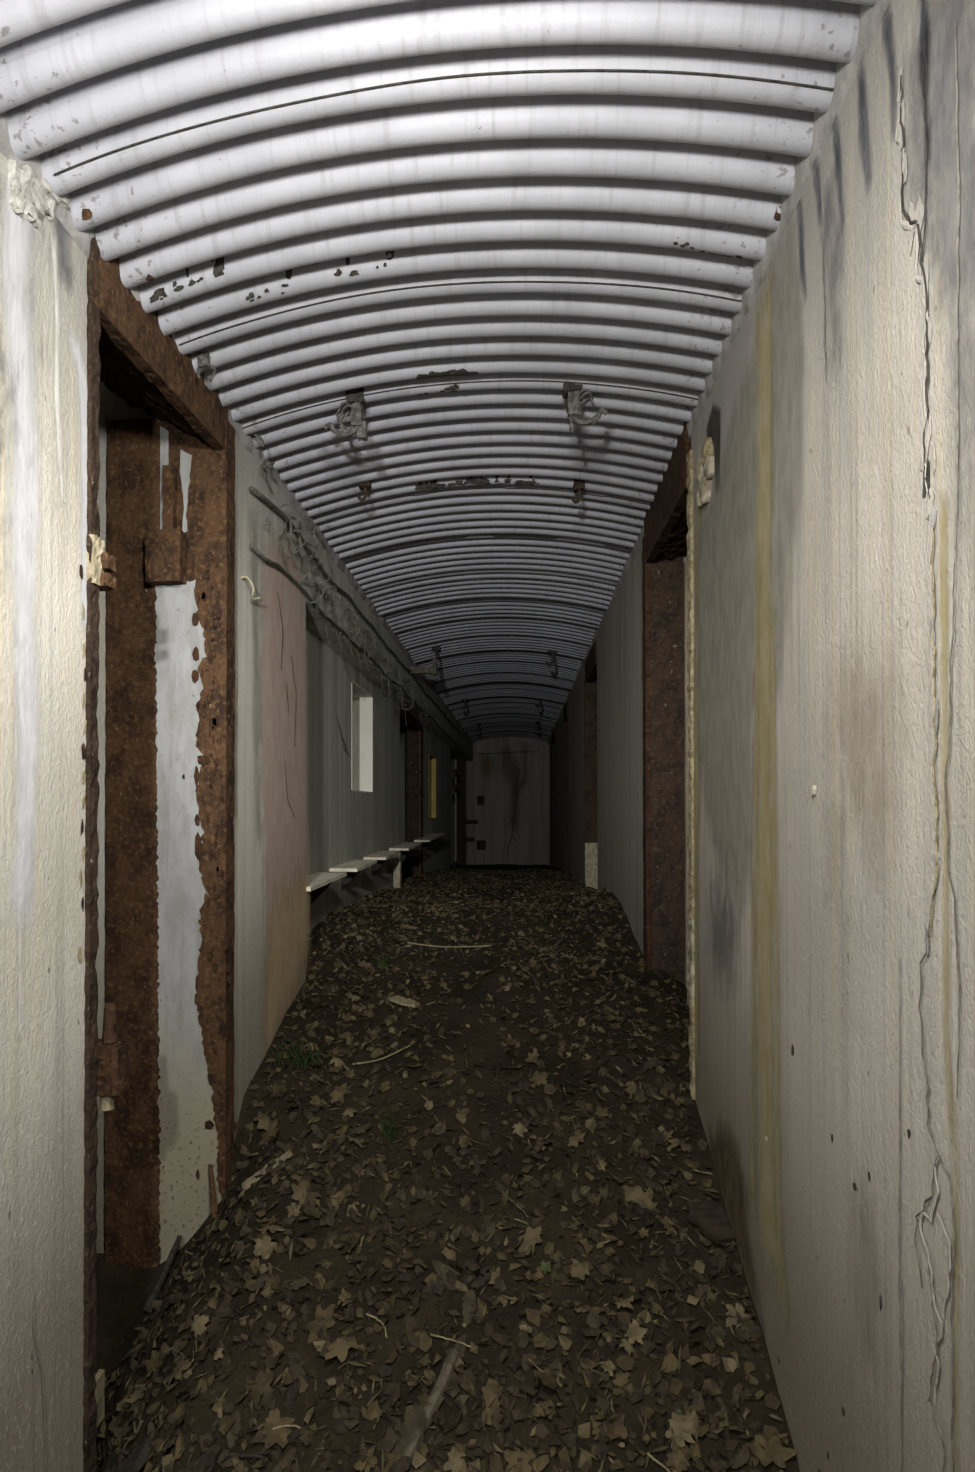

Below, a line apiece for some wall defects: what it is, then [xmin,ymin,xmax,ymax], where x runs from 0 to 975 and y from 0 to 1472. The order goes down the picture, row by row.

damp [858,70,869,184]
damp [883,0,975,401]
peeling [146,257,225,303]
peeling [245,263,319,302]
peeling [334,250,395,276]
peeling [160,426,192,533]
damp [693,124,843,1291]
crack [898,22,961,1472]
peeling [154,552,239,1264]